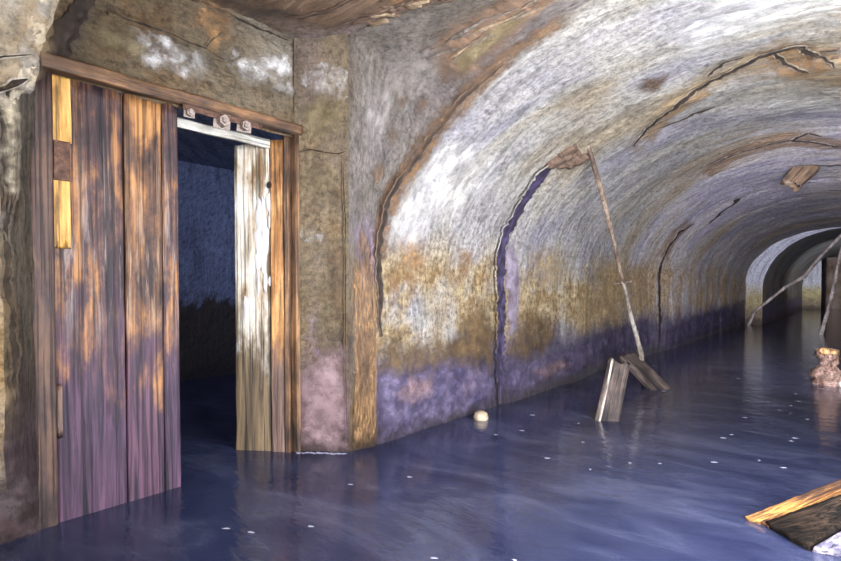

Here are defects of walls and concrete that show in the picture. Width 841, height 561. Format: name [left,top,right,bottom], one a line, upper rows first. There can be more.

spalling [266,0,446,29]
spalling [419,0,555,81]
crack [632,45,836,147]
crack [0,0,293,400]
rust [354,19,562,439]
crack [704,132,841,170]
damp [303,358,344,444]
damp [381,309,493,431]
crack [494,157,566,404]
damp [505,247,650,390]
damp [666,302,745,347]